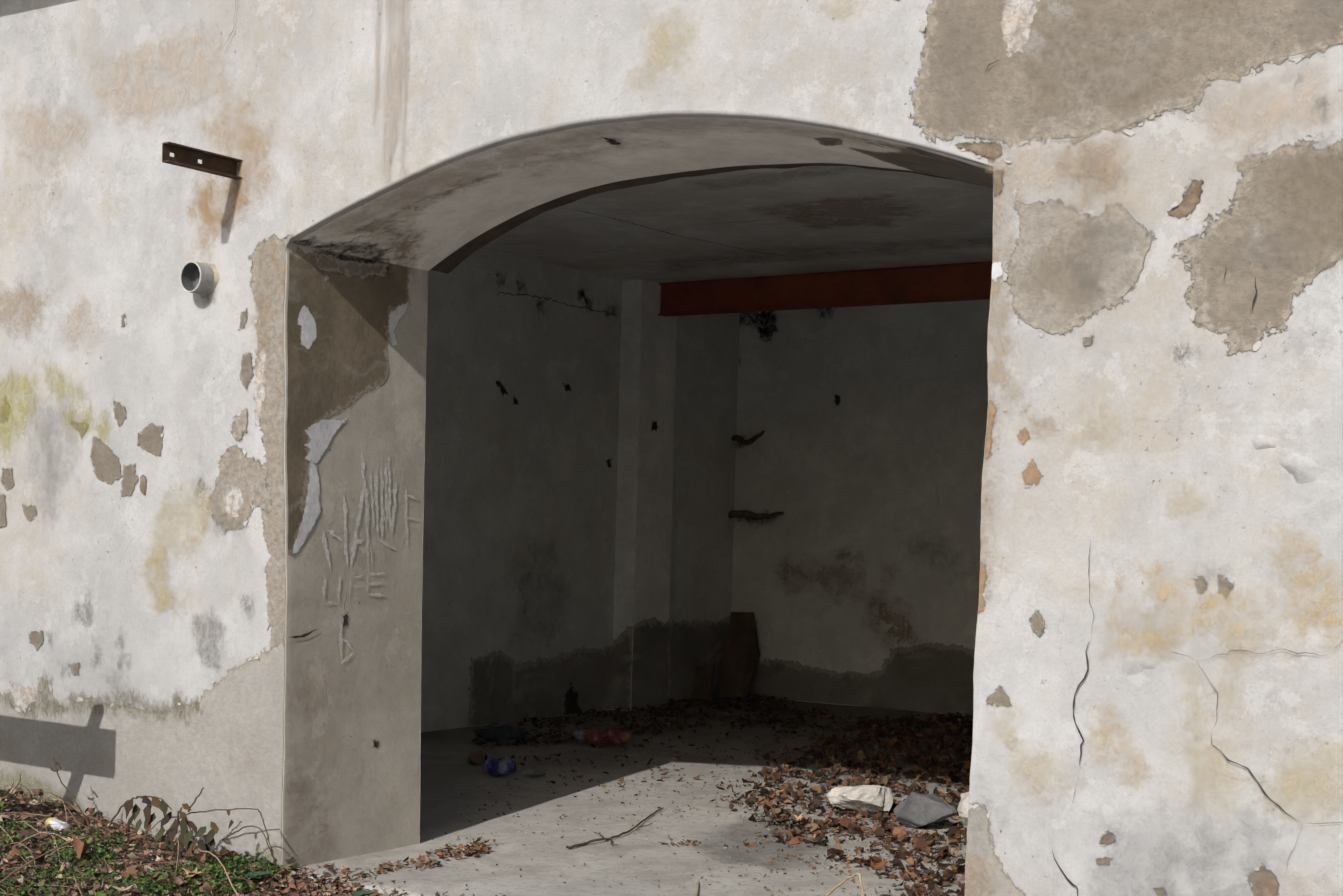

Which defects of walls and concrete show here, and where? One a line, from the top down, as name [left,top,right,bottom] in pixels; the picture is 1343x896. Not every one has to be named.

flaking render [814,0,1343,386]
peeling [984,401,1007,459]
peeling [0,228,419,869]
peeling [978,562,987,613]
peeling [965,803,1026,896]
crack [1052,850,1084,896]
crack [1072,540,1094,803]
crack [1167,644,1342,865]